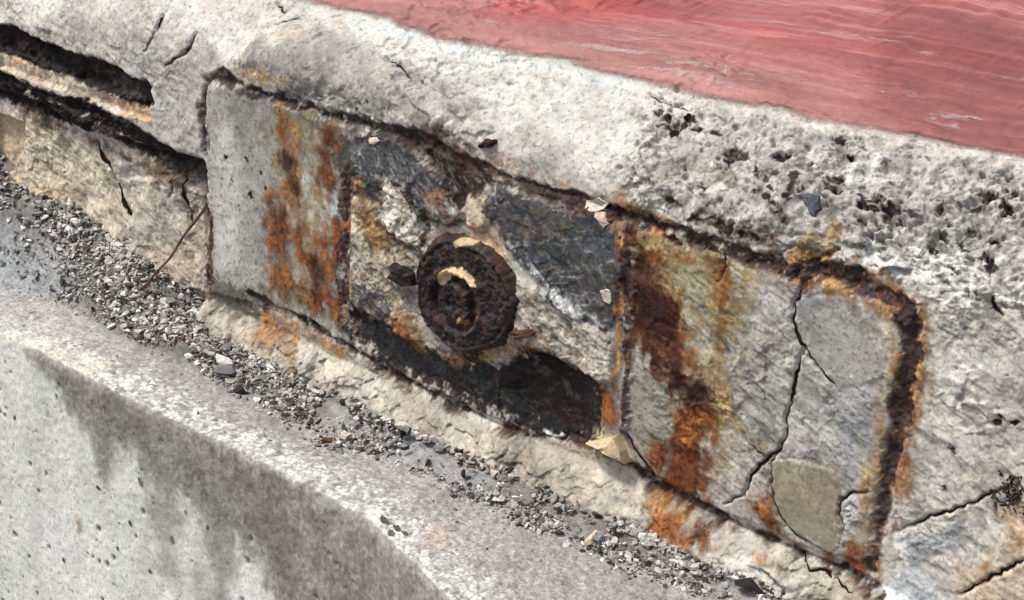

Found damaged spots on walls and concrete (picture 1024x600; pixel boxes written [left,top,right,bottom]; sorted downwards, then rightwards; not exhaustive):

spalling [0,23,208,182]
crack [98,141,133,215]
leakage [24,347,446,600]
corrosion [252,102,365,374]
peeling [585,197,610,228]
peeling [600,289,612,304]
corrosion [600,188,760,552]
crack [726,287,852,593]
corrosion [786,221,841,265]
corrosion [731,272,928,582]
crack [903,489,1001,528]
crack [960,559,1024,593]